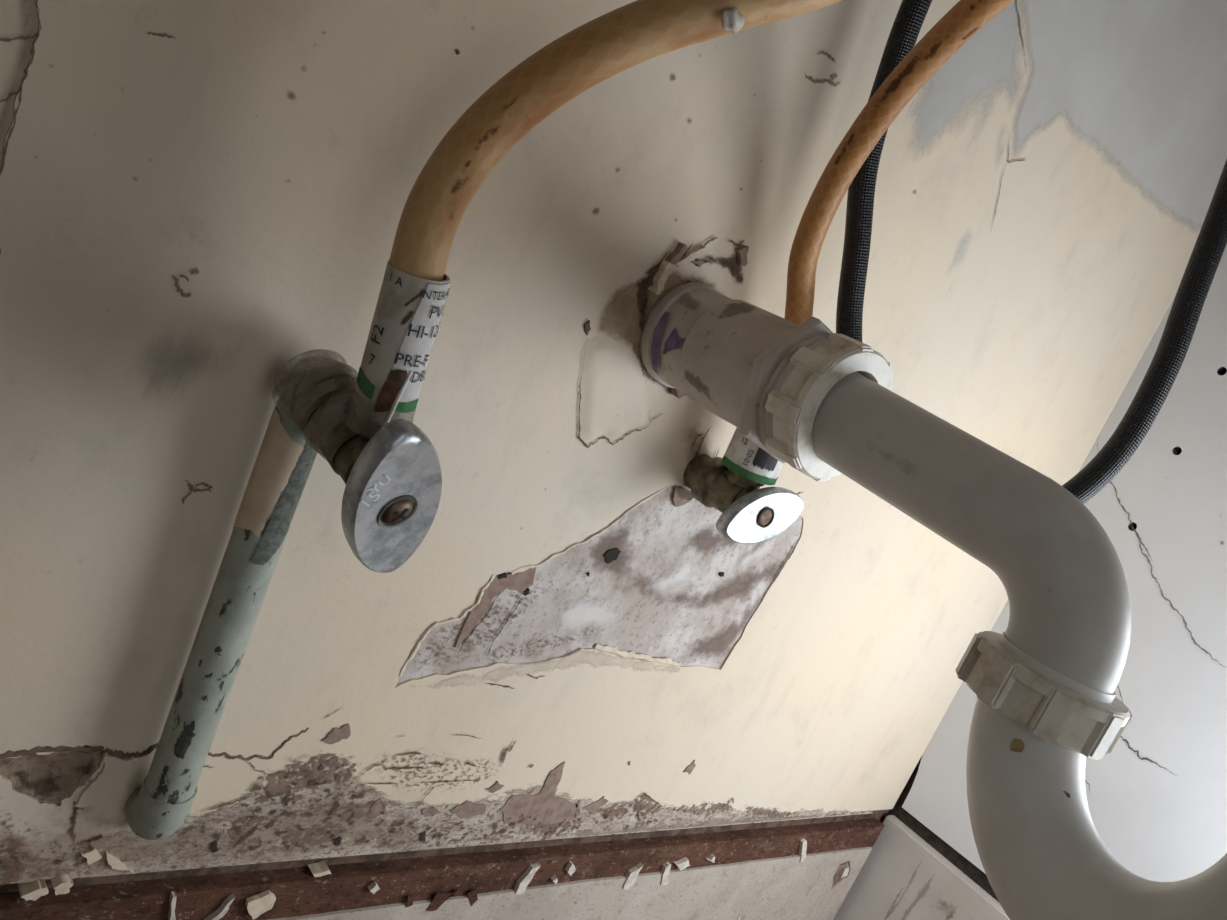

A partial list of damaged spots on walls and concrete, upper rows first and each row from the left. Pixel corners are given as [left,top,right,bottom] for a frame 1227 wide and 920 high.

peeling [993,0,1227,228]
flaking render [601,237,749,398]
peeling [397,485,802,689]
crack [1110,482,1223,666]
crack [69,802,97,845]
crack [203,709,340,775]
peeling [0,721,873,901]
crack [1117,685,1172,773]